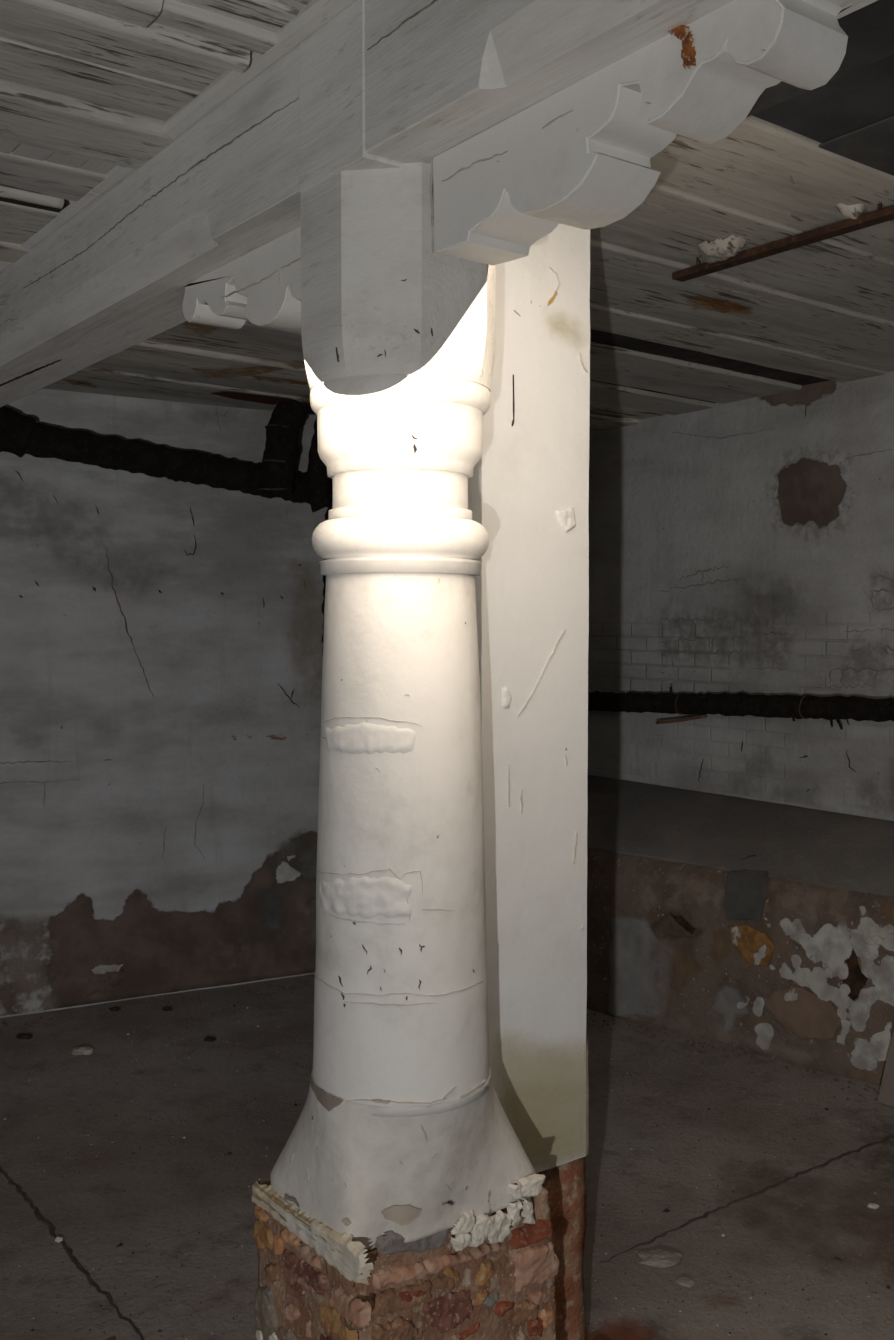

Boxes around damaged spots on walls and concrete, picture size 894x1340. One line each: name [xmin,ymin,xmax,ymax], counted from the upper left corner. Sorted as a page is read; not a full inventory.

crack [367,0,438,51]
crack [542,110,579,131]
crack [430,151,508,253]
flaking render [777,458,846,529]
crack [105,547,154,697]
flaking render [47,831,318,1008]
peeling [714,906,894,1071]
spalling [309,1067,343,1111]